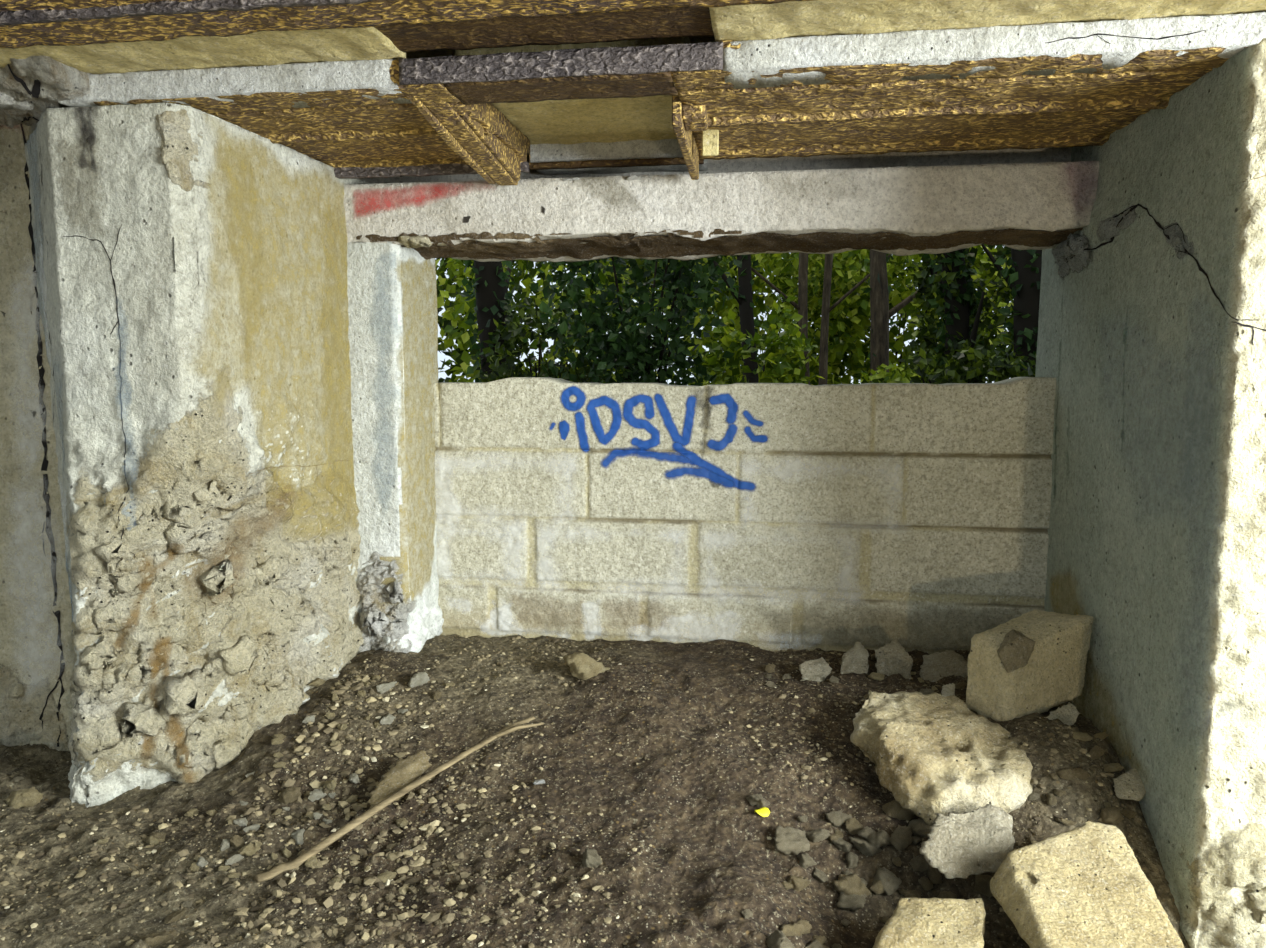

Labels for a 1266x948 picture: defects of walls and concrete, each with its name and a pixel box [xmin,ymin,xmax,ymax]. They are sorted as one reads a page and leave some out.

spalling [0,55,91,131]
crack [1066,203,1266,345]
crack [0,64,135,747]
spalling [0,366,417,784]
spalling [1181,823,1266,948]